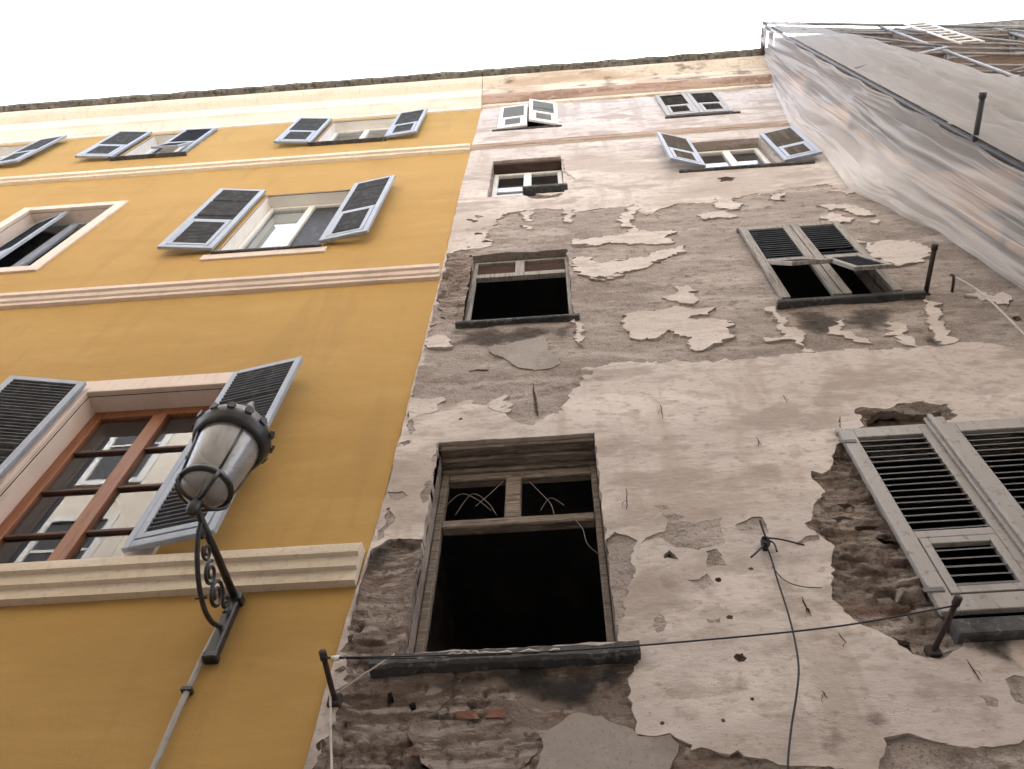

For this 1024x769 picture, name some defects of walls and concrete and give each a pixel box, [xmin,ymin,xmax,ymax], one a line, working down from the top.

flaking render [399,160,1024,446]
water stain [800,313,837,332]
water stain [851,311,886,329]
spalling [795,443,963,660]
spalling [312,492,642,769]
water stain [497,667,621,703]
flaking render [1005,675,1024,704]
spalling [671,738,834,769]
flaking render [878,735,1024,769]